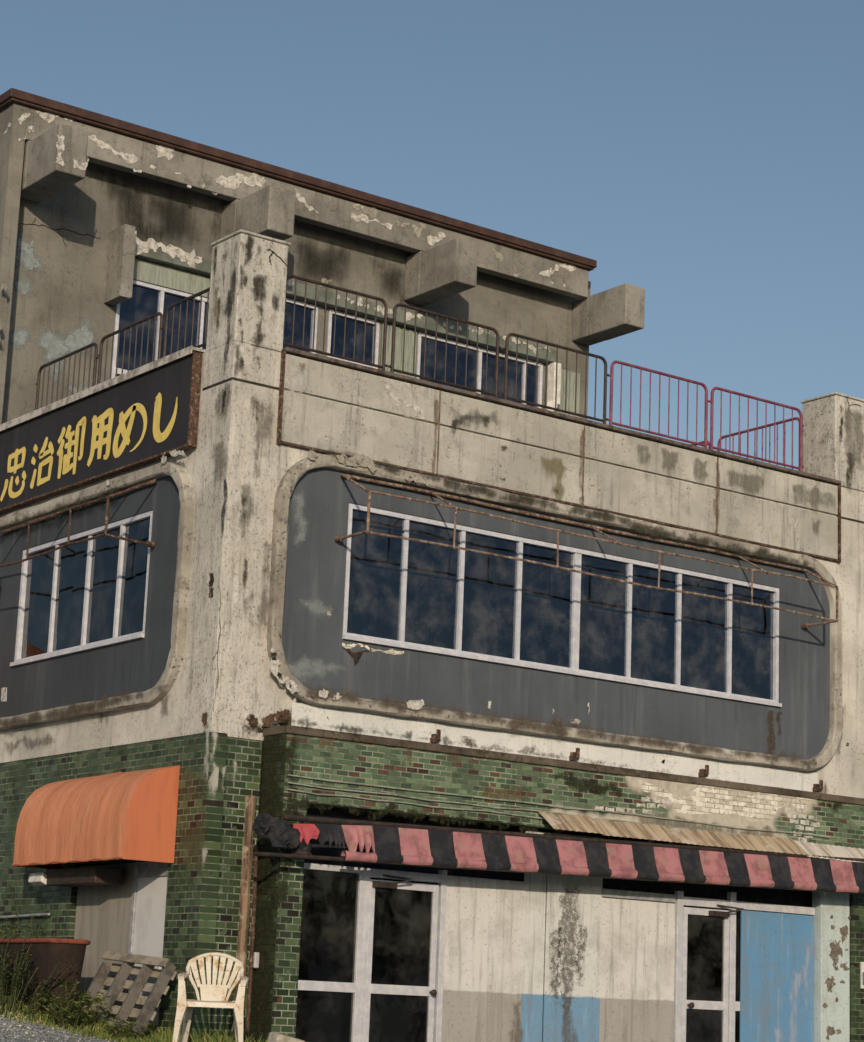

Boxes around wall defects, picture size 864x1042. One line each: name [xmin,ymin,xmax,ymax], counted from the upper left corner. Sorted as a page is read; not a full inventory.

crack [18,218,97,246]
leakage [109,179,188,238]
peeling [135,237,202,268]
peeling [350,203,446,246]
leakage [213,235,279,374]
peeling [0,319,94,394]
leakage [215,443,227,533]
flaking render [342,643,404,666]
leakage [204,730,236,791]
corrosion [767,711,781,754]
spalling [551,771,820,842]
leakage [549,885,587,1042]